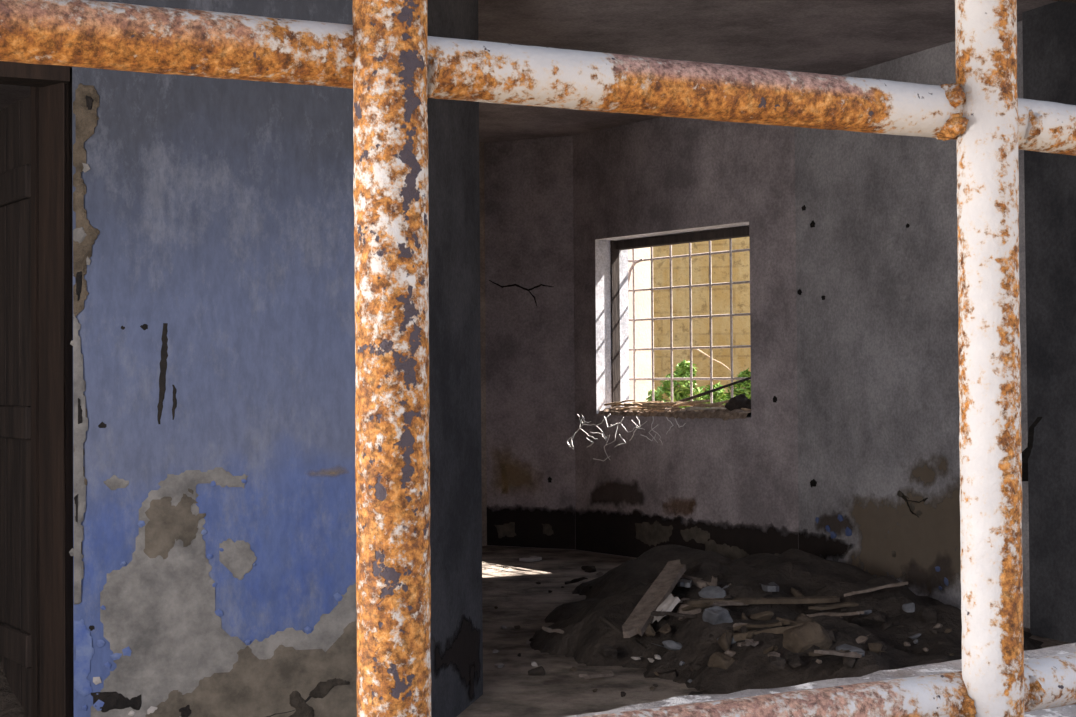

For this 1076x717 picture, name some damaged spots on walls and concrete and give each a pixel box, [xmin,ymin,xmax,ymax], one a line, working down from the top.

flaking render [69,83,107,604]
crack [489,280,552,306]
peeling [74,467,357,717]
damp [487,481,852,560]